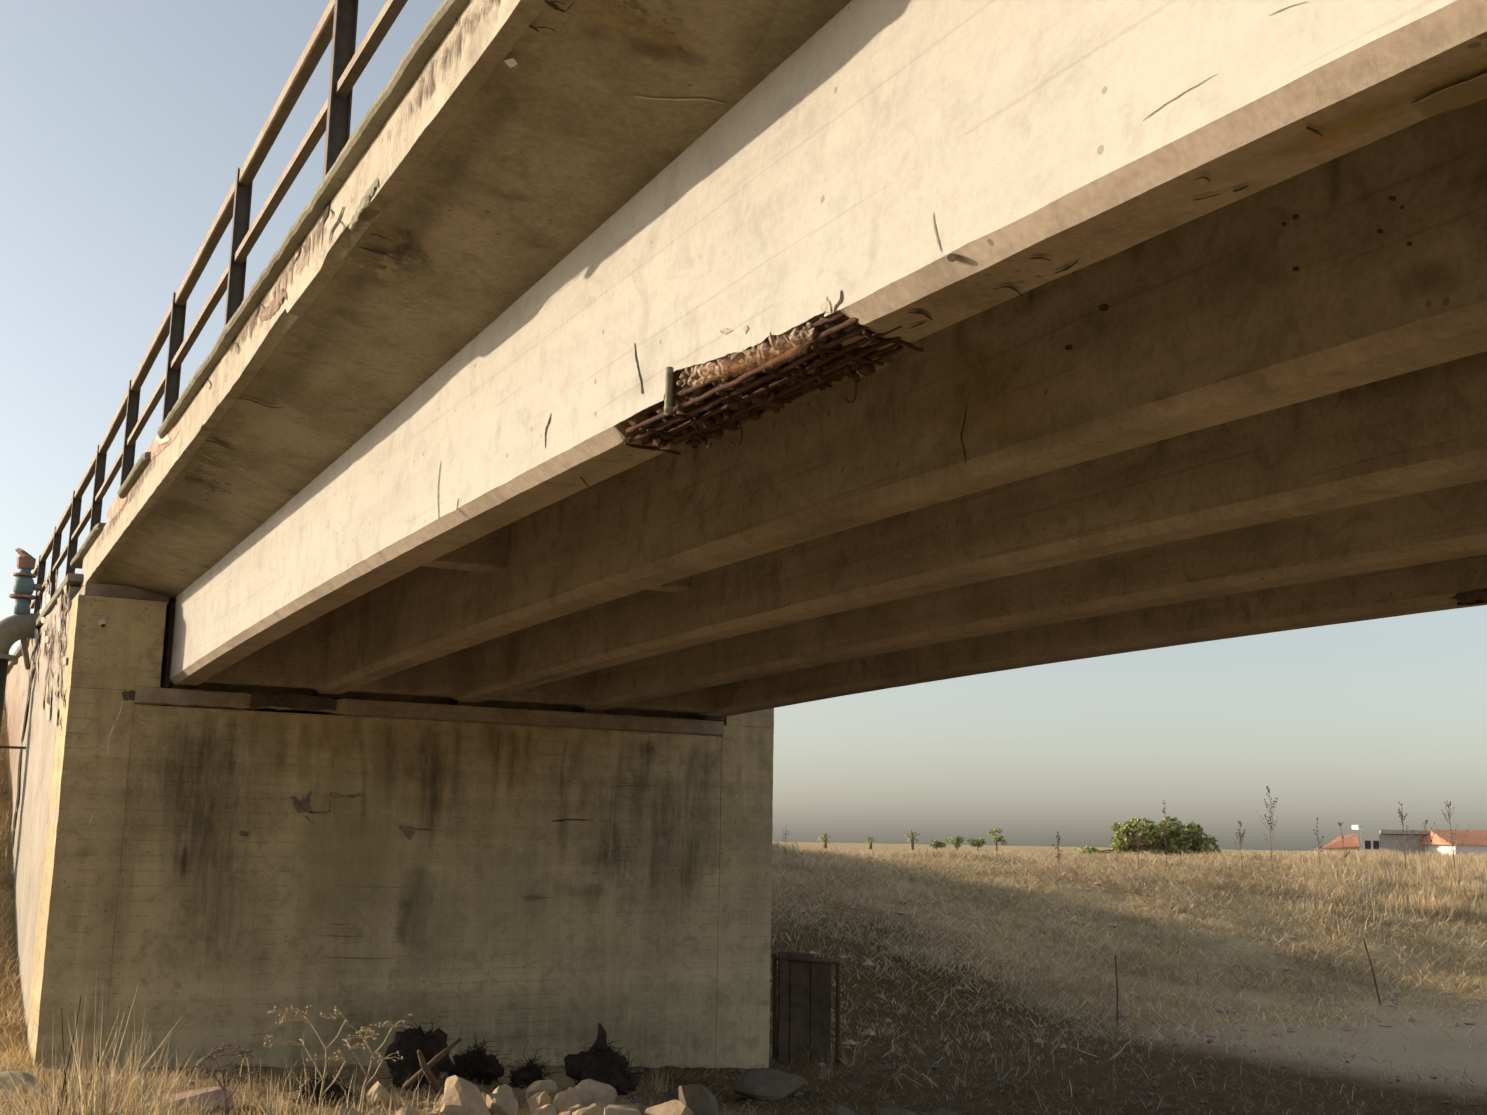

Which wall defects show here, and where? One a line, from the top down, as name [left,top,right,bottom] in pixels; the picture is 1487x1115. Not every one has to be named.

spalling [624,290,924,455]
spalling [1451,589,1487,606]